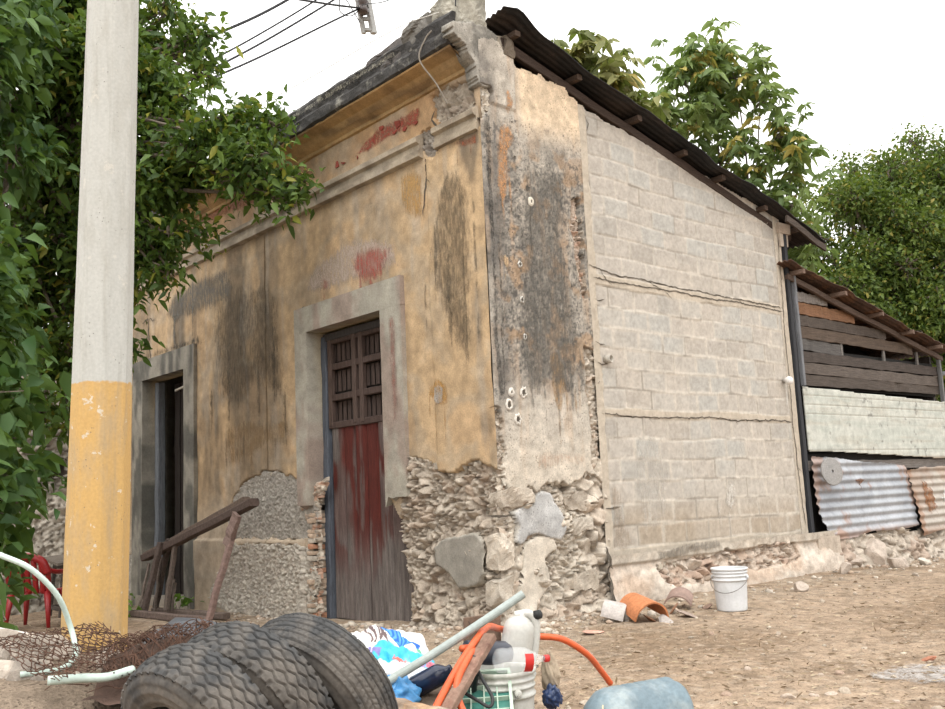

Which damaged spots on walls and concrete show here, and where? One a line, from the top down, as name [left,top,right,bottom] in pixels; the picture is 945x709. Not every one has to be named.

water stain [486,116,512,240]
water stain [157,272,277,399]
water stain [493,254,508,395]
water stain [524,177,581,395]
crack [591,234,806,523]
flaking render [207,470,330,618]
flaking render [399,349,613,628]
spalling [656,541,799,587]
rust [922,482,936,512]